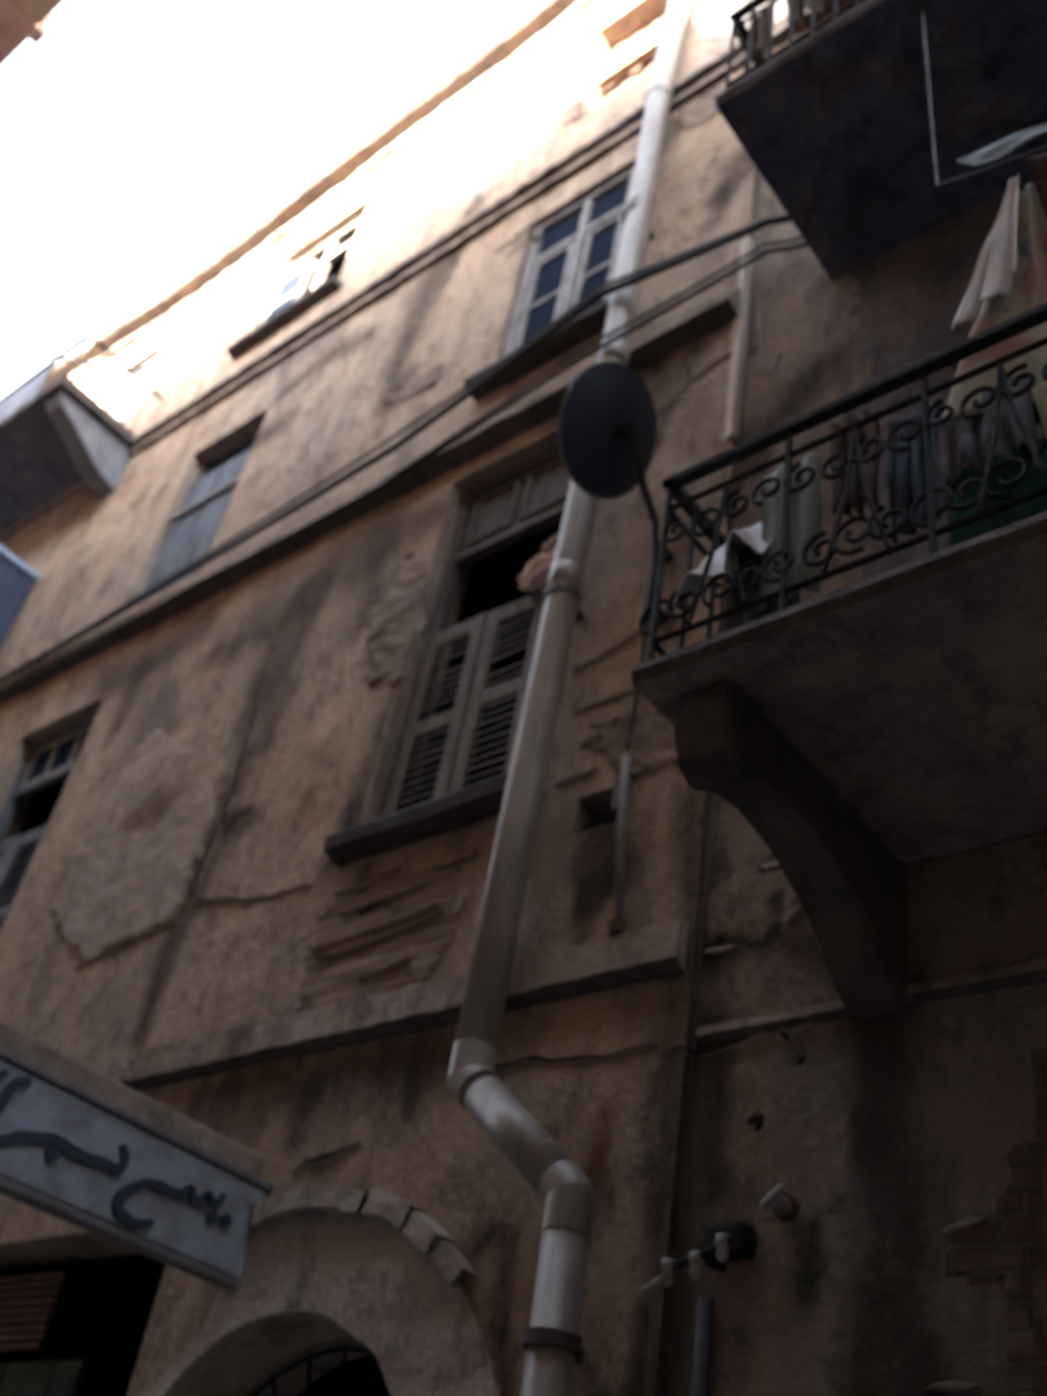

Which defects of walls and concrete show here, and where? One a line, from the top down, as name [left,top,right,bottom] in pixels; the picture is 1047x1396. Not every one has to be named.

crack [74,628,313,1041]
water stain [134,509,438,1045]
flaking render [295,865,465,1011]
crack [494,1022,813,1072]